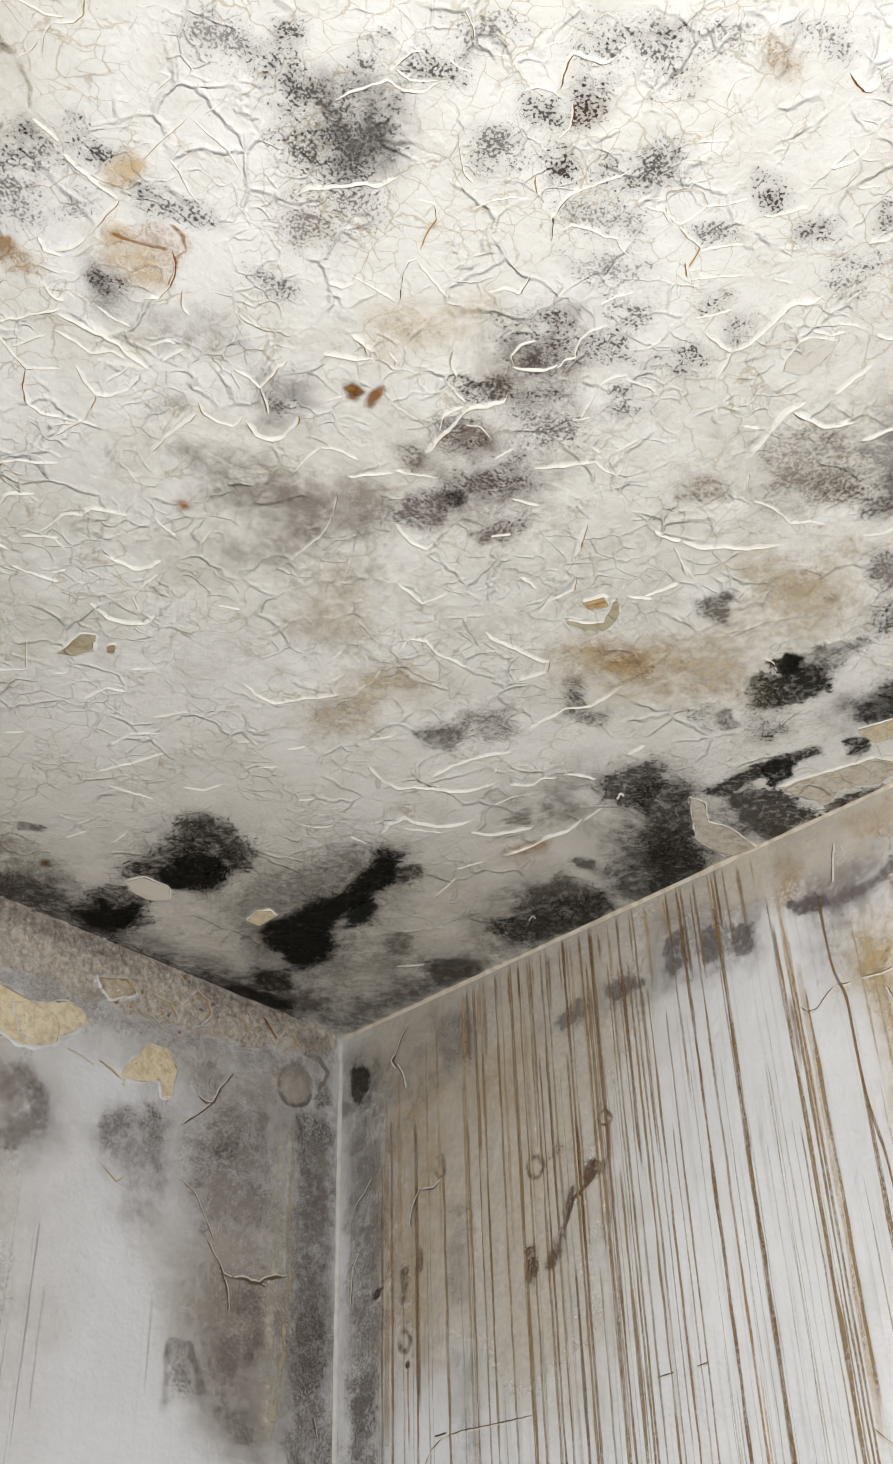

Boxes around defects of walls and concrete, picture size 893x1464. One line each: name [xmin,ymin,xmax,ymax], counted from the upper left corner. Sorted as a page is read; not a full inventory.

damp [245,18,472,246]
damp [467,10,695,194]
damp [354,295,708,545]
flaking render [520,523,783,632]
damp [0,812,262,964]
peeling [124,874,173,900]
flaking render [0,896,340,1102]
damp [197,847,423,1012]
damp [349,551,893,1378]
flaking render [687,794,758,857]
crack [829,844,837,882]
flaking render [776,717,893,806]